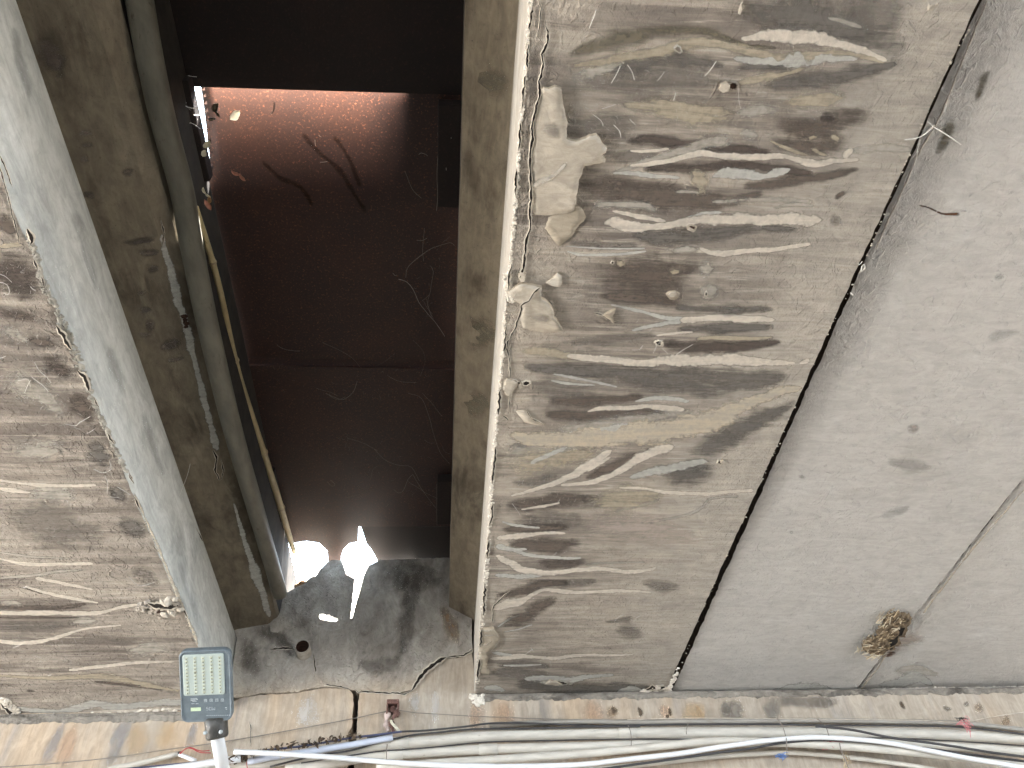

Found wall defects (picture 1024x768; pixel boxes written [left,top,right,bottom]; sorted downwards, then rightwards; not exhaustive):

crack [517,1,550,278]
water stain [0,214,37,298]
water stain [3,311,70,378]
crack [505,335,513,377]
peeling [475,1,607,694]
water stain [494,0,909,632]
water stain [71,395,93,422]
water stain [0,479,96,540]
water stain [0,552,137,645]
water stain [0,643,179,692]
crack [270,646,473,696]
water stain [484,652,649,693]